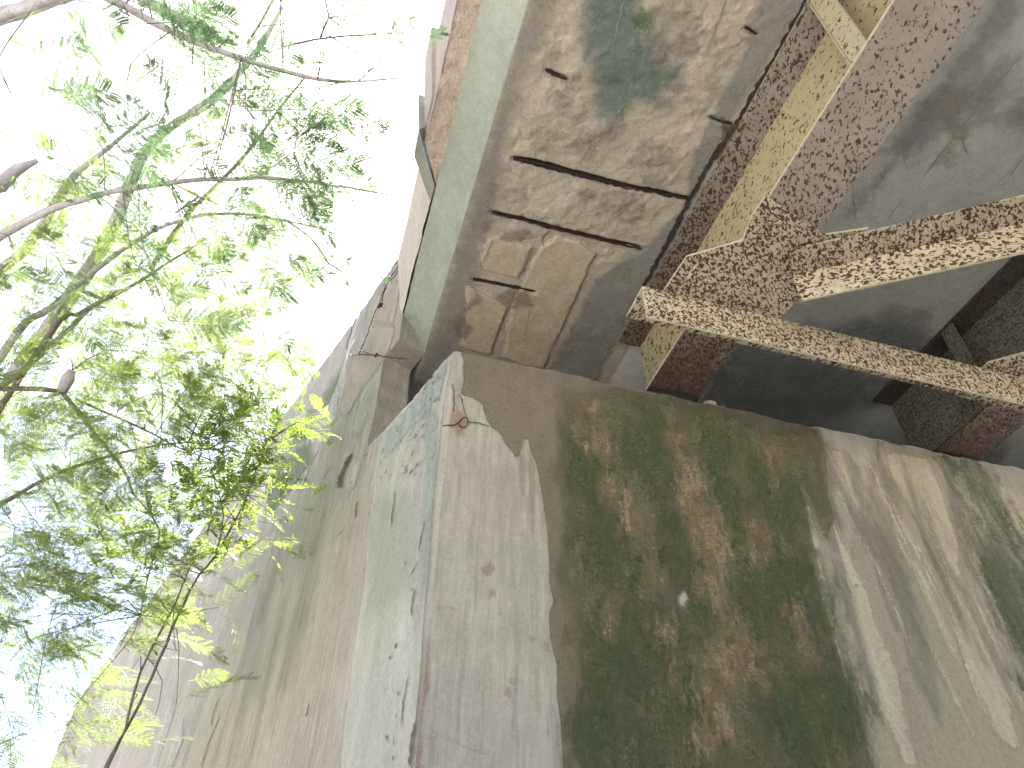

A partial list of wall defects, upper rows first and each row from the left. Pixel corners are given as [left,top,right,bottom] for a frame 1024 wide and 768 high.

crack [454,231,549,364]
peeling [459,210,642,368]
crack [546,255,596,365]
leakage [341,74,1024,768]